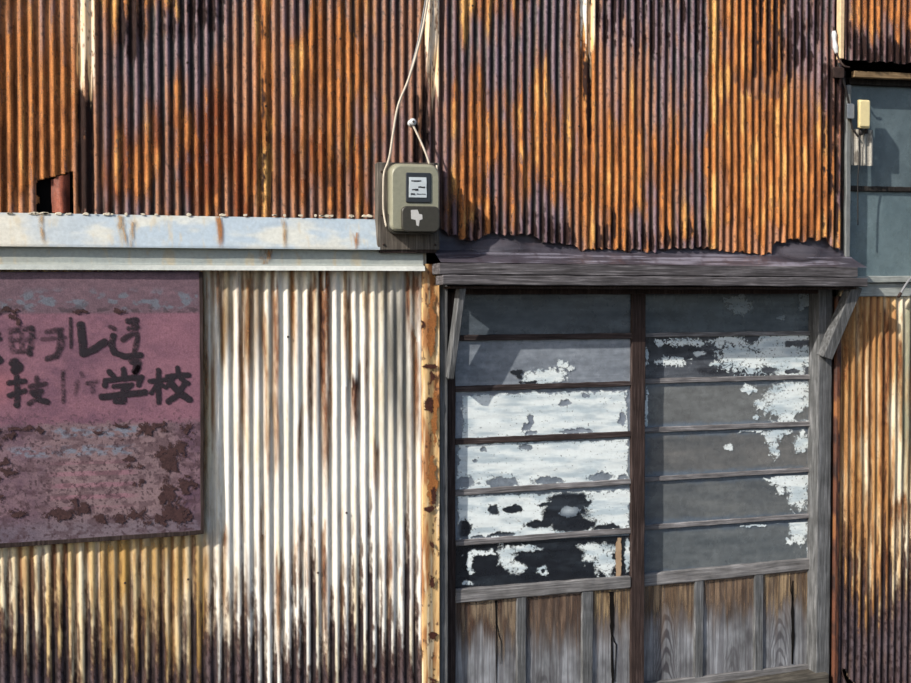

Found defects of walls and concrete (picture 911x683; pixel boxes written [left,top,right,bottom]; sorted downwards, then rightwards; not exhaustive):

rust [0,9,93,216]
spalling [28,171,113,216]
rust [447,0,911,253]
leakage [246,274,263,342]
leakage [384,275,413,420]
peeling [645,335,809,461]
peeling [457,359,630,585]
peeling [763,475,808,511]
rust [838,297,911,683]
rust [0,493,436,683]
crack [609,592,617,683]
crack [788,576,796,664]